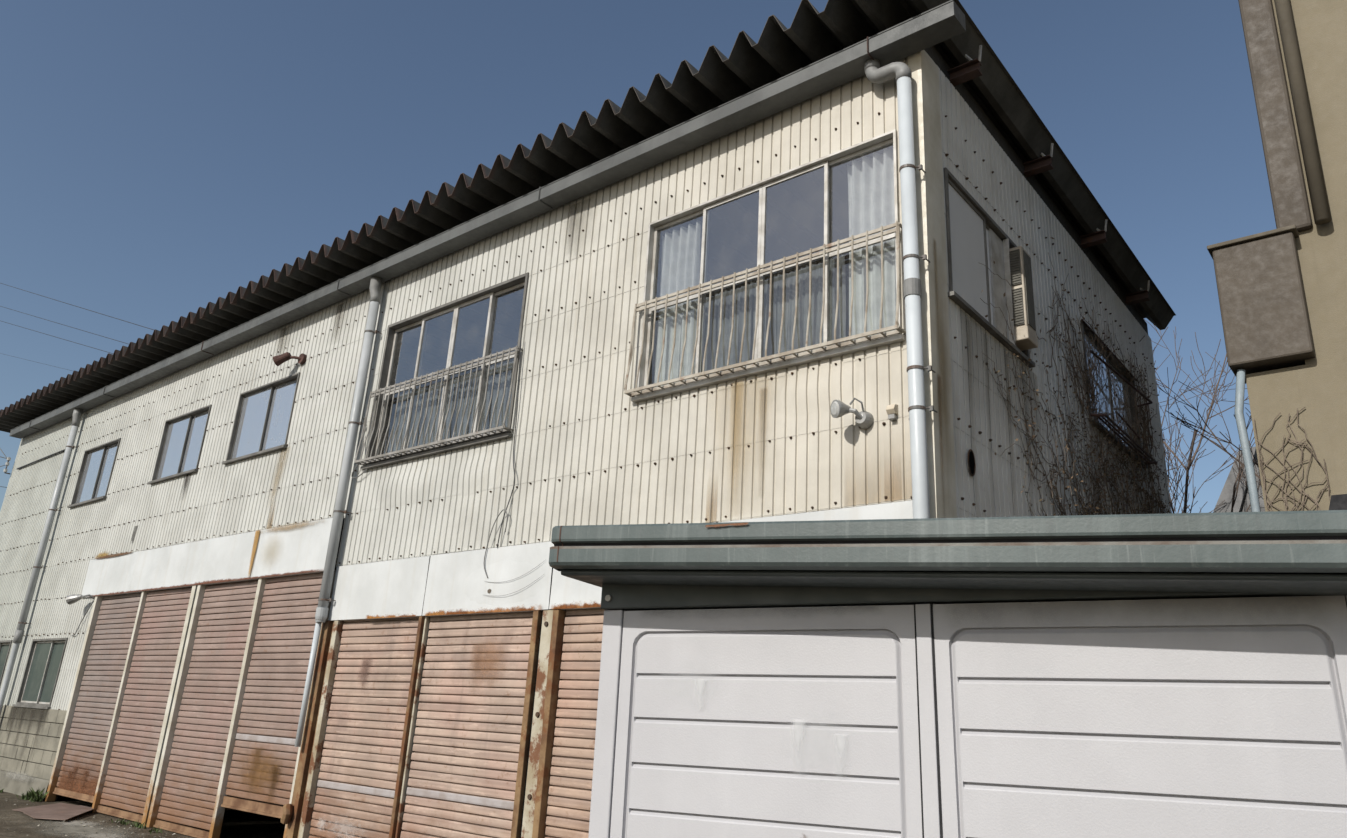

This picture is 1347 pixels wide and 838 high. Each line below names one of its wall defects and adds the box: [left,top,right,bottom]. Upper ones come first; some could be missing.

rust [92,523,319,596]